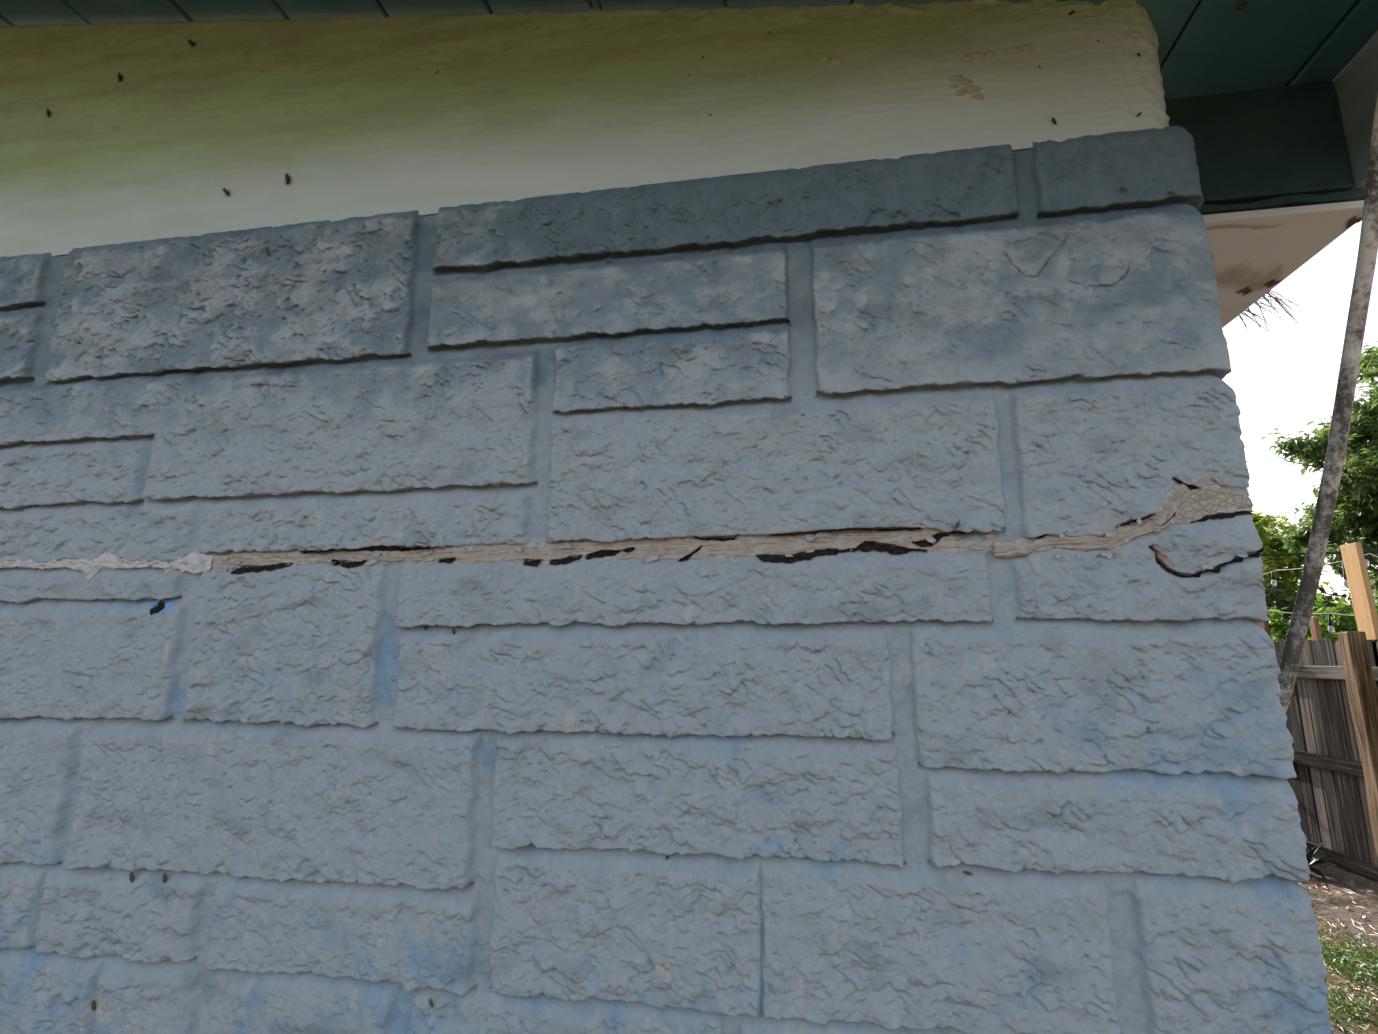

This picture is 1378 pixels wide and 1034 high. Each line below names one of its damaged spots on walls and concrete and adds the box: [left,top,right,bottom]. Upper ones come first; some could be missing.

crack [0,520,1264,582]